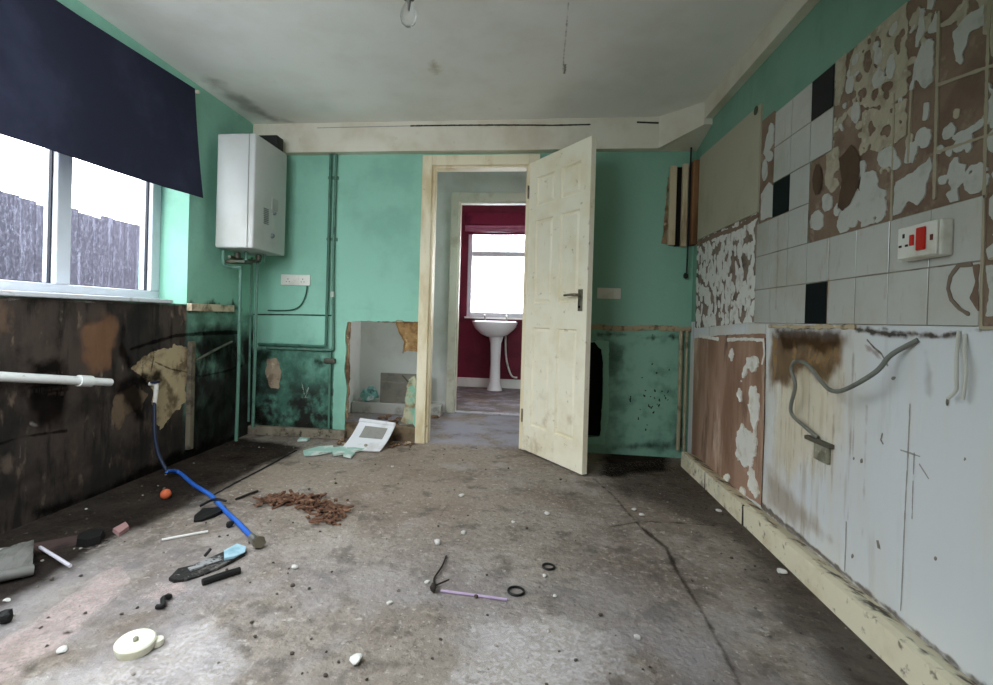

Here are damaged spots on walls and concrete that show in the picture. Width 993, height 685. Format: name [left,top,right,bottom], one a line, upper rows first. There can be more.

peeling [809,0,993,330]
flaking render [85,322,117,369]
flaking render [111,344,187,430]
leakage [591,324,692,339]
peeling [691,111,776,507]
leakage [768,324,956,385]
leakage [0,327,299,605]